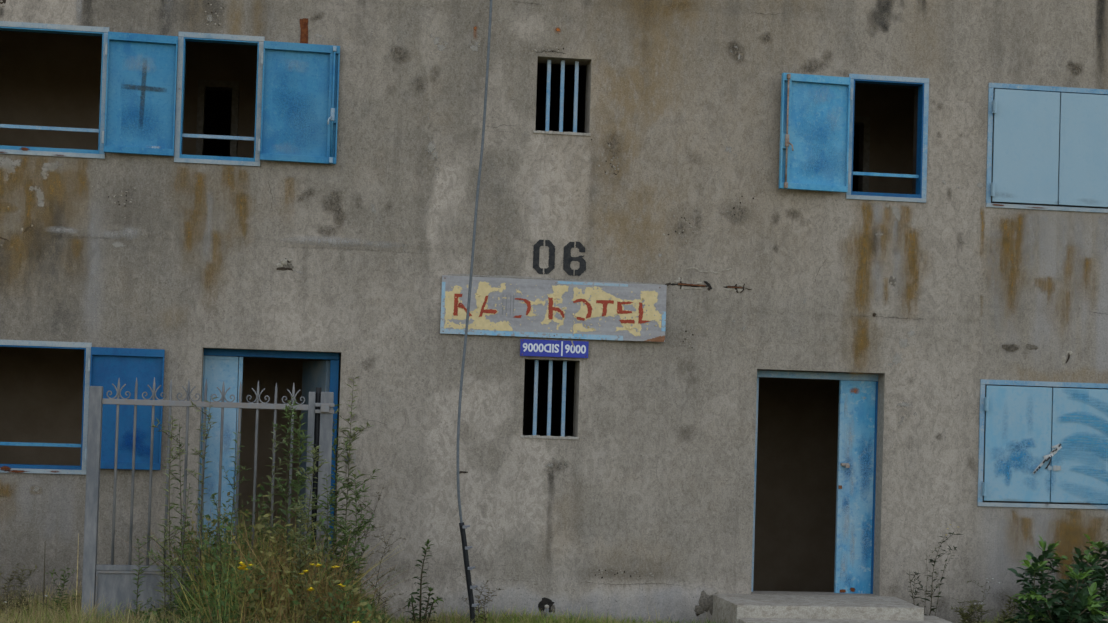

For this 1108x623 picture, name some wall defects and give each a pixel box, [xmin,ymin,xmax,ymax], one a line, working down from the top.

corrosion [300,18,308,44]
corrosion [857,204,885,307]